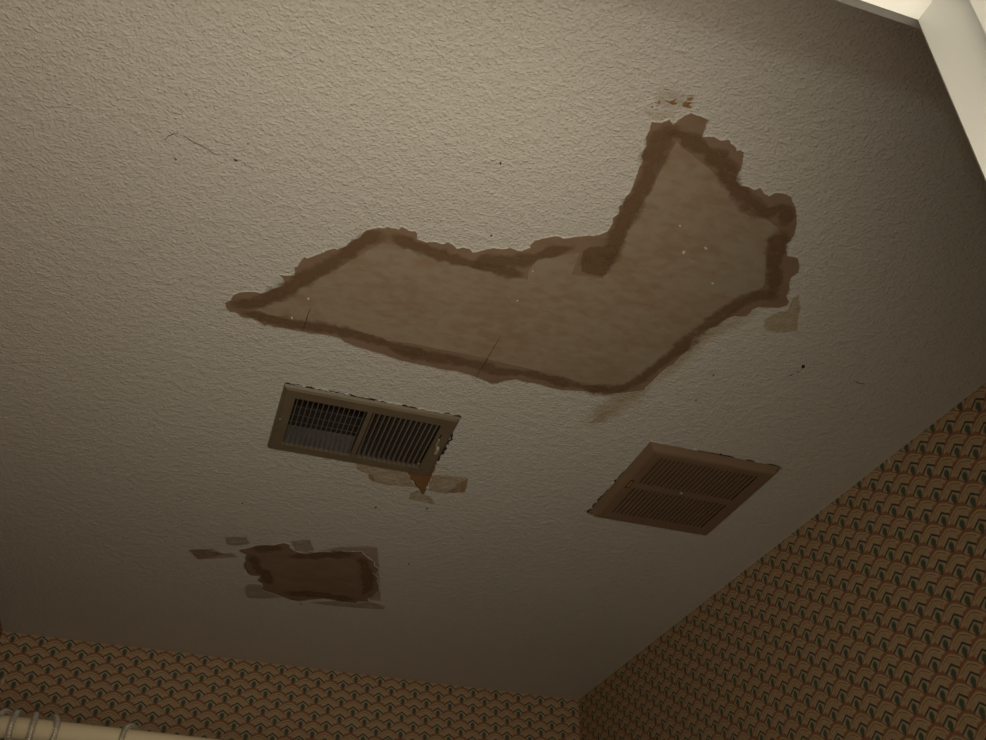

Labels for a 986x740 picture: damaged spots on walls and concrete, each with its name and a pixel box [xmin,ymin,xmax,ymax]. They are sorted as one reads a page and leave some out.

peeling [223,111,802,395]
peeling [237,542,380,605]